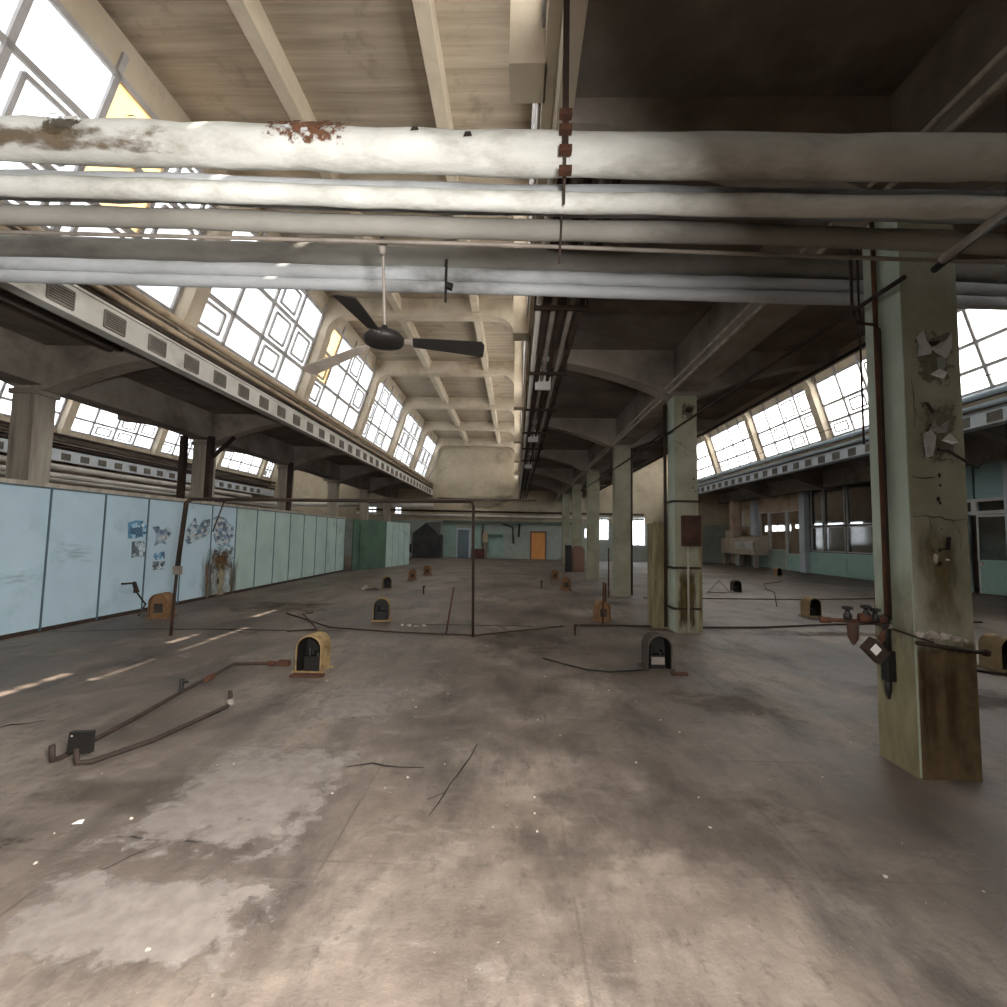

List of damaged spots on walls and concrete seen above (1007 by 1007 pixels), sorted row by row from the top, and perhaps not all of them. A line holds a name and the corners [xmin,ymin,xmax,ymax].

corrosion [0,127,141,152]
corrosion [266,120,349,143]
peeling [915,330,954,384]
peeling [921,402,958,464]
corrosion [204,547,236,598]
crack [345,761,423,769]
crack [427,743,478,815]